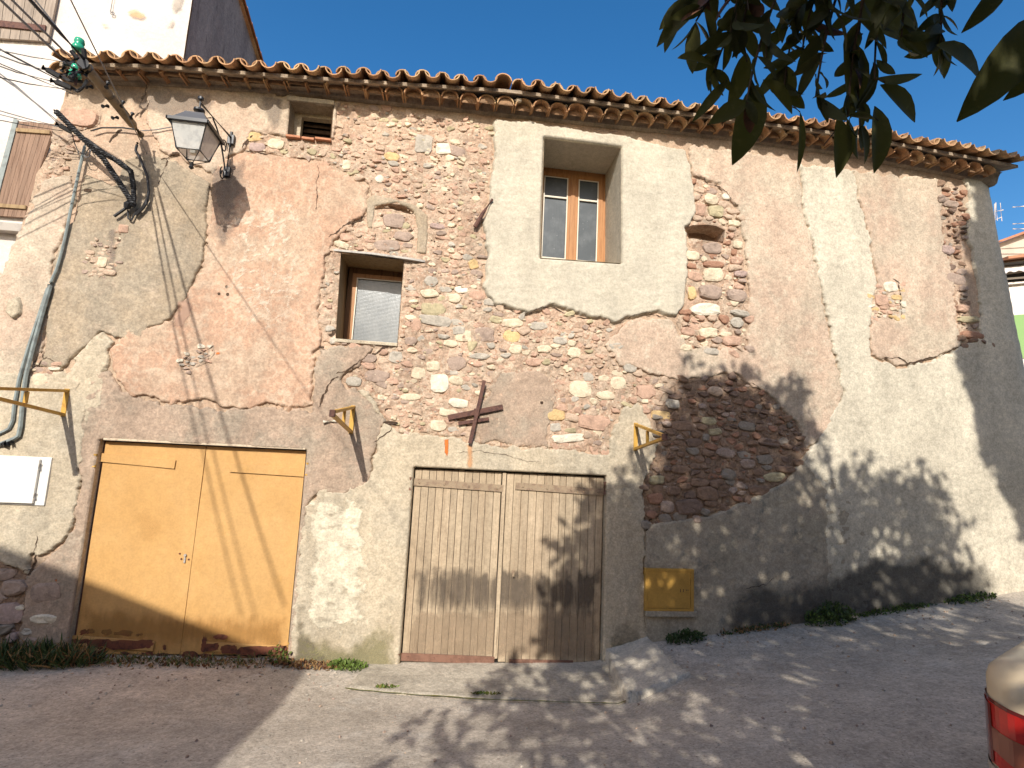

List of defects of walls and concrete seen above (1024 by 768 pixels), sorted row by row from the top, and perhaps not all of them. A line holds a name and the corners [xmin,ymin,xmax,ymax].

spalling [81,224,129,279]
spalling [937,180,995,348]
spalling [245,103,809,530]
spalling [867,280,907,321]
spalling [176,342,215,374]
crack [319,346,396,407]
spalling [0,562,61,650]
corrosion [72,629,168,656]
corrosion [182,634,287,658]